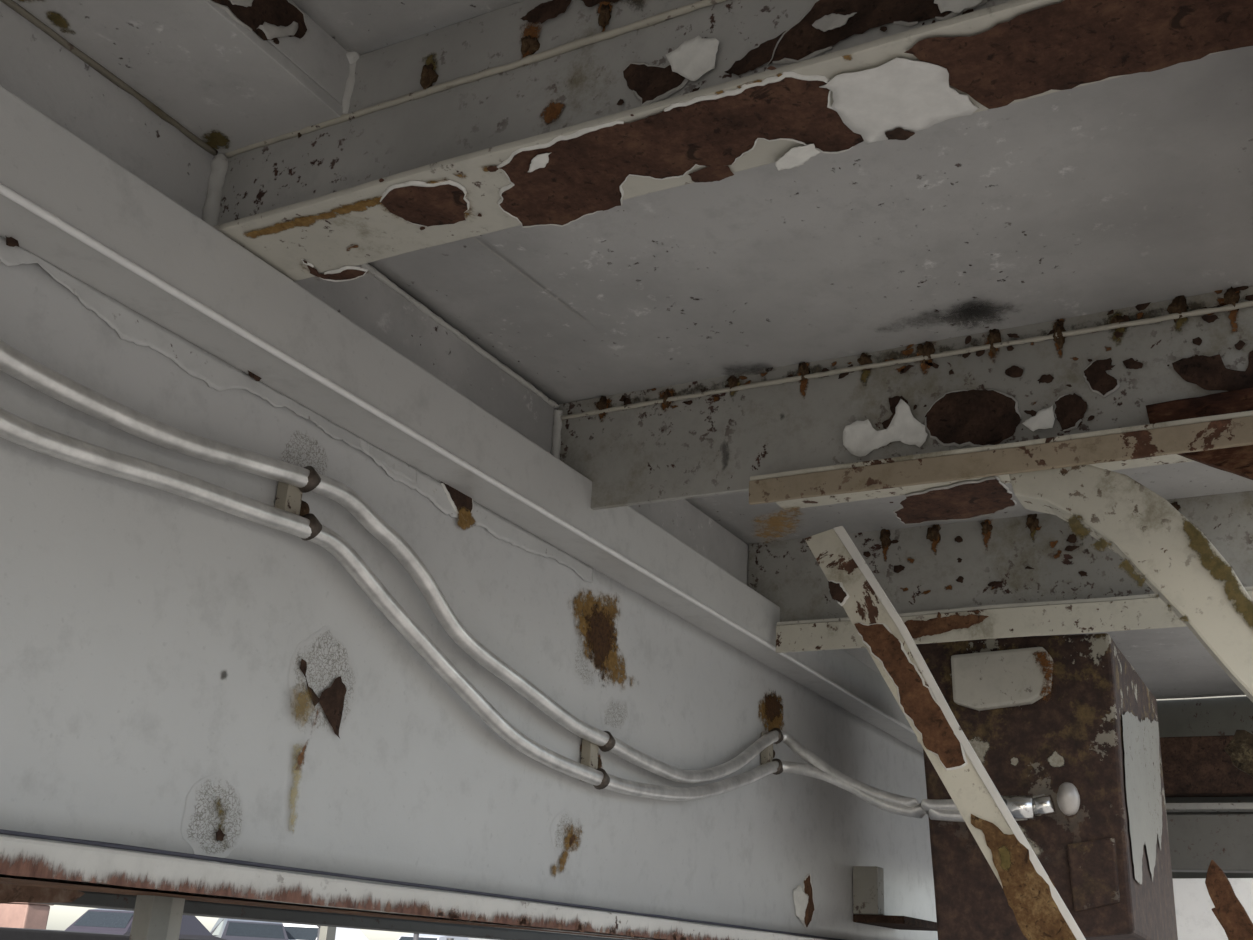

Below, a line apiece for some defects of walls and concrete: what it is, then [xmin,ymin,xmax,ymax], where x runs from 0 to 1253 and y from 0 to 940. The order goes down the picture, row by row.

peeling [206,0,308,44]
peeling [487,0,1253,228]
peeling [378,178,482,230]
corrosion [1225,288,1240,332]
corrosion [797,363,810,397]
peeling [843,302,1151,457]
peeling [1167,337,1253,391]
corrosion [570,590,633,732]
peeling [292,659,347,738]
corrosion [758,692,785,732]
corrosion [550,809,584,877]
corrosion [0,854,729,940]